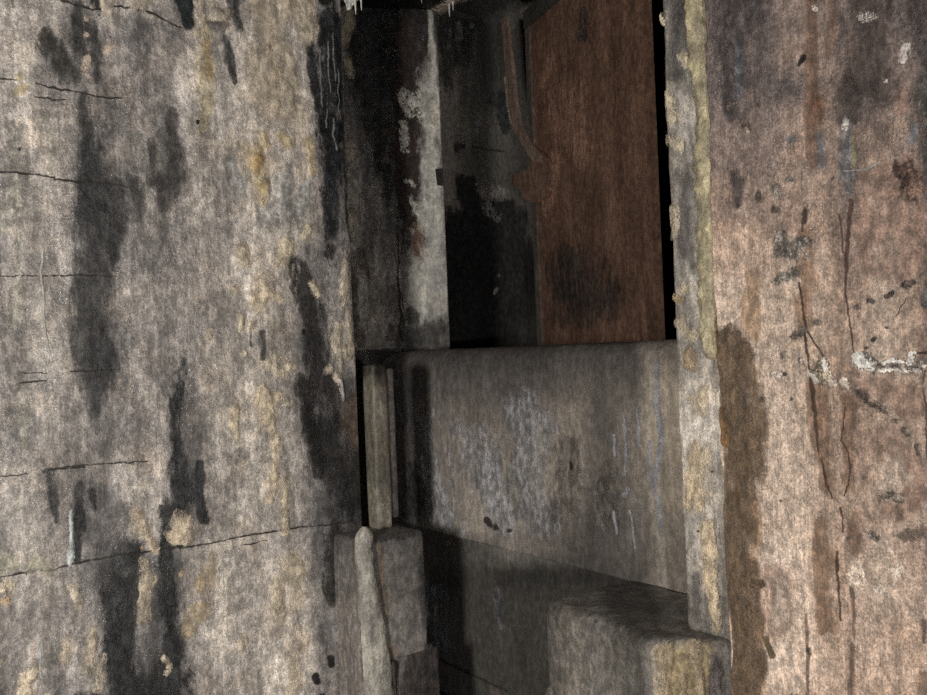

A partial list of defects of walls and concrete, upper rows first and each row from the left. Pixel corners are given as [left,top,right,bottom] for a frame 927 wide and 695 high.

crack [0,78,121,101]
crack [0,171,130,188]
water stain [69,95,185,418]
water stain [227,0,441,536]
water stain [664,92,677,124]
water stain [669,167,700,372]
crack [838,199,854,353]
crack [1,461,148,477]
crack [0,520,354,578]
water stain [376,387,585,618]
water stain [675,324,789,695]
crack [798,282,851,621]